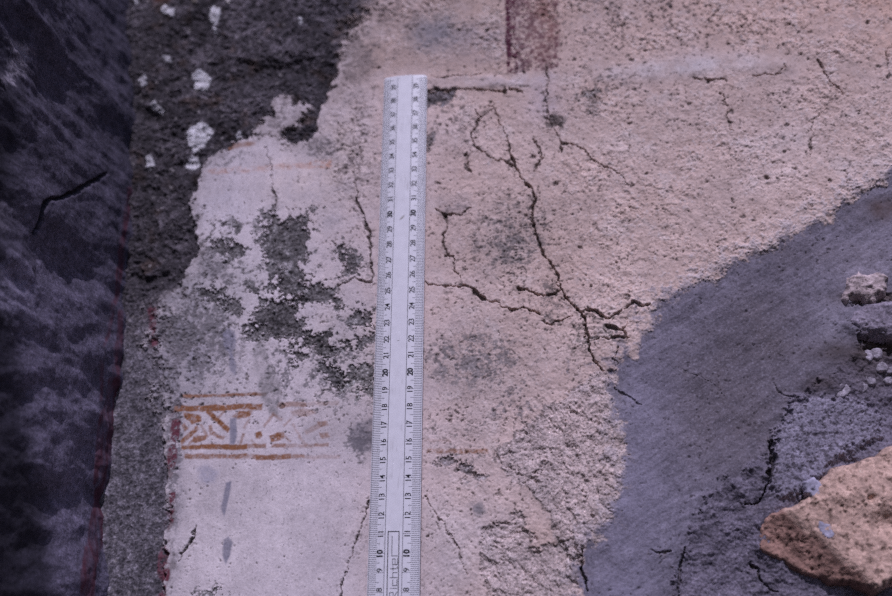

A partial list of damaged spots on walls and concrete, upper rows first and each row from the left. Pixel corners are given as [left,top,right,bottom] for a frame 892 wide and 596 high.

crack [31,171,108,234]
crack [337,182,375,287]
crack [424,67,651,405]
flaking render [192,198,376,408]
crack [340,499,370,596]